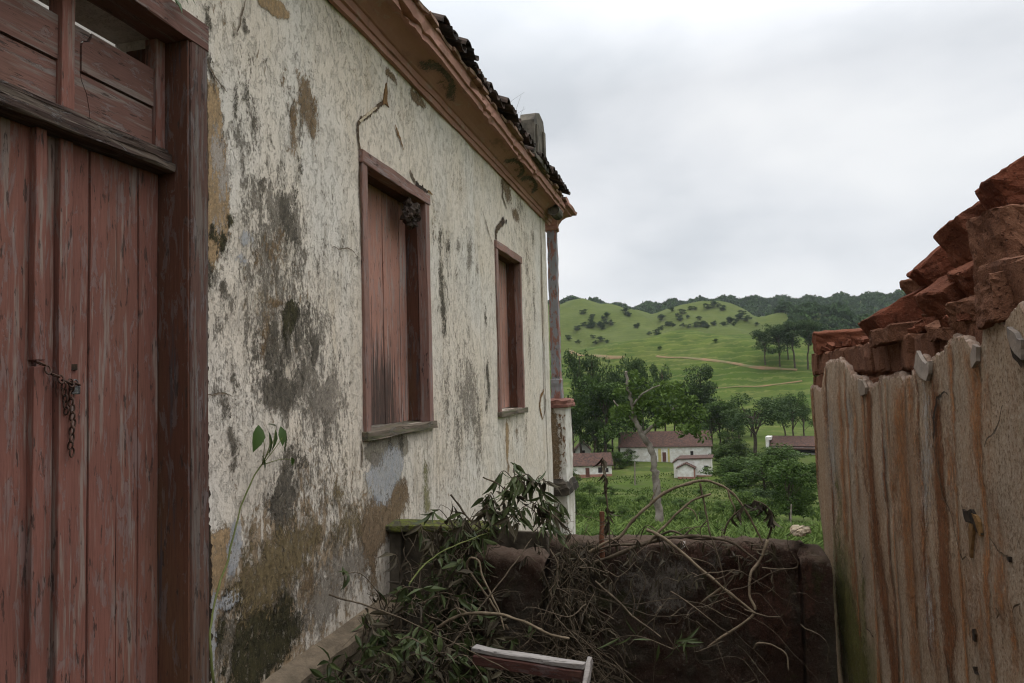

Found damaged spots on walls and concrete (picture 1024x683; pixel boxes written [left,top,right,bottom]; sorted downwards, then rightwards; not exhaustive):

spalling [258,0,290,20]
mould [208,213,234,252]
spalling [207,73,254,302]
leakage [232,78,262,145]
leakage [252,58,320,273]
crack [332,75,433,257]
leakage [215,437,377,683]
leakage [253,295,350,455]
spalling [357,443,412,578]
rust [551,408,563,479]
rust [810,367,905,683]
rust [902,342,997,683]